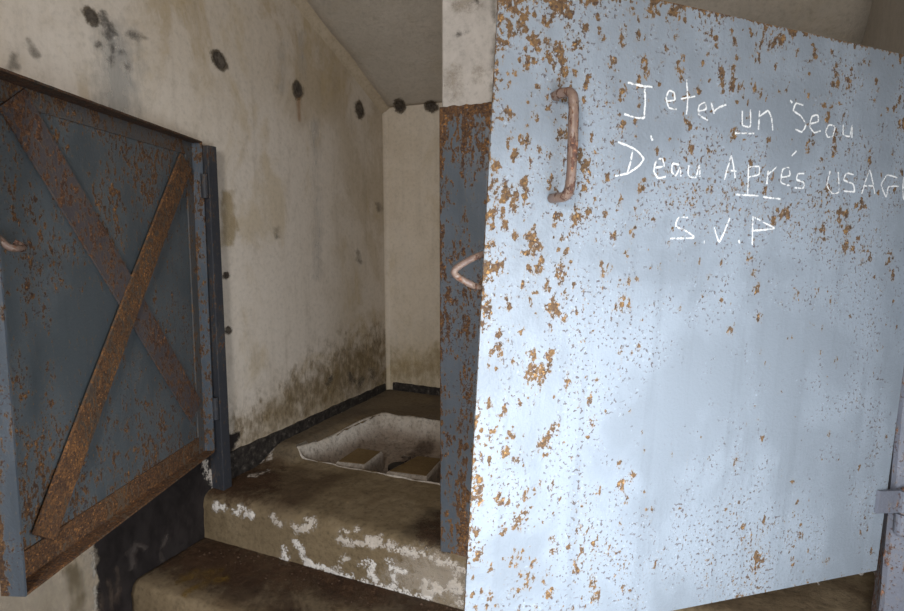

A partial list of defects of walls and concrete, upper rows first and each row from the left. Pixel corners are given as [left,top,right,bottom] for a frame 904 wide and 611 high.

damp [235,338,386,435]